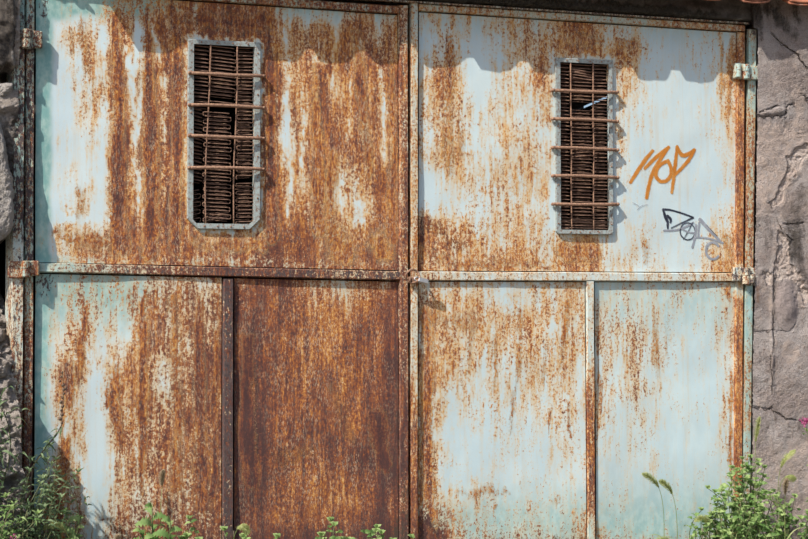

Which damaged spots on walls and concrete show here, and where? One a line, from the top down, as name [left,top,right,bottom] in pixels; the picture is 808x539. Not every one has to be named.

rust [52,3,186,264]
rust [190,50,281,255]
rust [309,63,358,266]
rust [442,35,465,175]
rust [418,214,551,271]
rust [42,437,71,539]
rust [62,302,88,409]
rust [104,364,123,448]
rust [136,289,150,498]
rust [166,290,221,514]
rust [418,305,478,539]
rust [509,308,523,429]